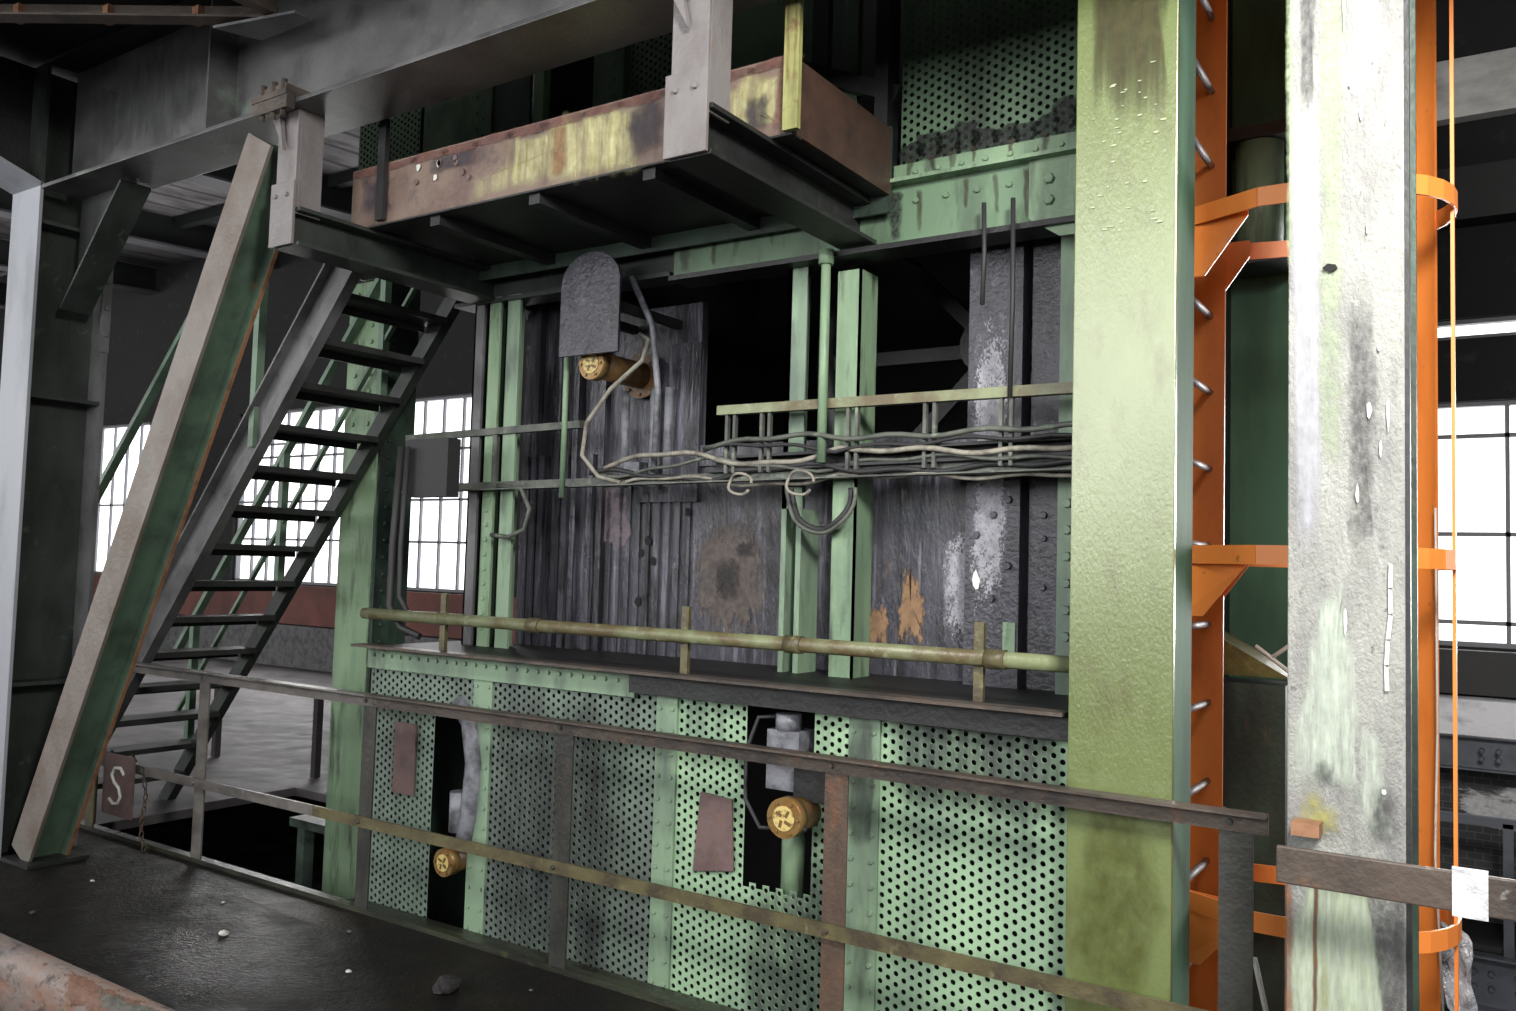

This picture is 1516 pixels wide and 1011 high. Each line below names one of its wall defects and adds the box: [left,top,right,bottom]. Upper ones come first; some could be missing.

corrosion [356,90,665,210]
corrosion [730,56,784,127]
leakage [1287,0,1340,525]
leakage [1353,344,1371,519]
corrosion [870,569,925,643]
leakage [1299,593,1389,830]
leakage [1291,888,1403,1011]